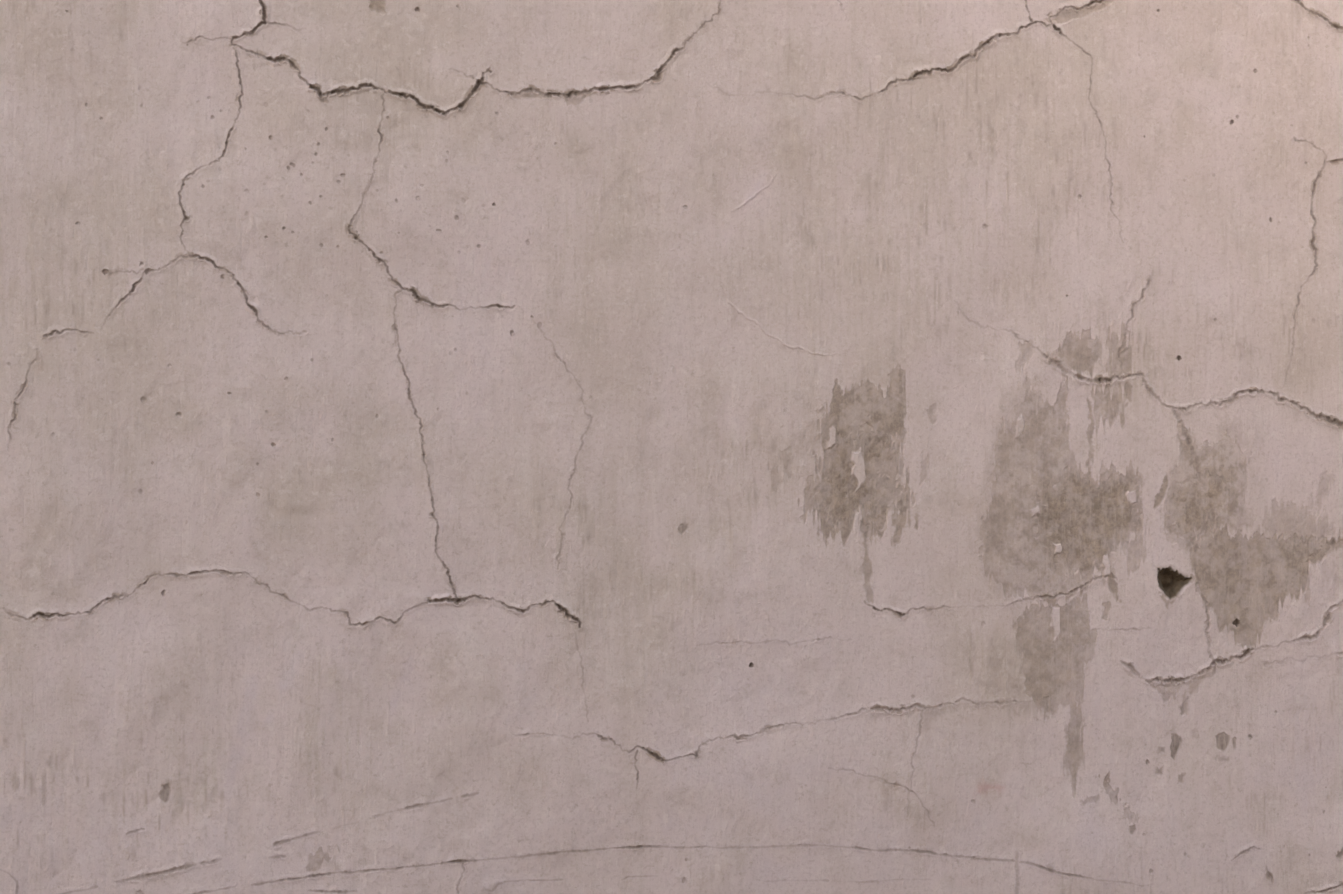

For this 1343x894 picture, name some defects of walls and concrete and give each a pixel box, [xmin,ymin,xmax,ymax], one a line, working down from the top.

crack [704,0,1125,244]
crack [1291,0,1343,31]
crack [0,0,1039,827]
crack [954,136,1343,503]
leakage [862,372,1047,732]
crack [863,574,1109,619]
peeling [978,321,1343,837]
crack [1092,571,1343,684]
crack [1230,846,1343,894]